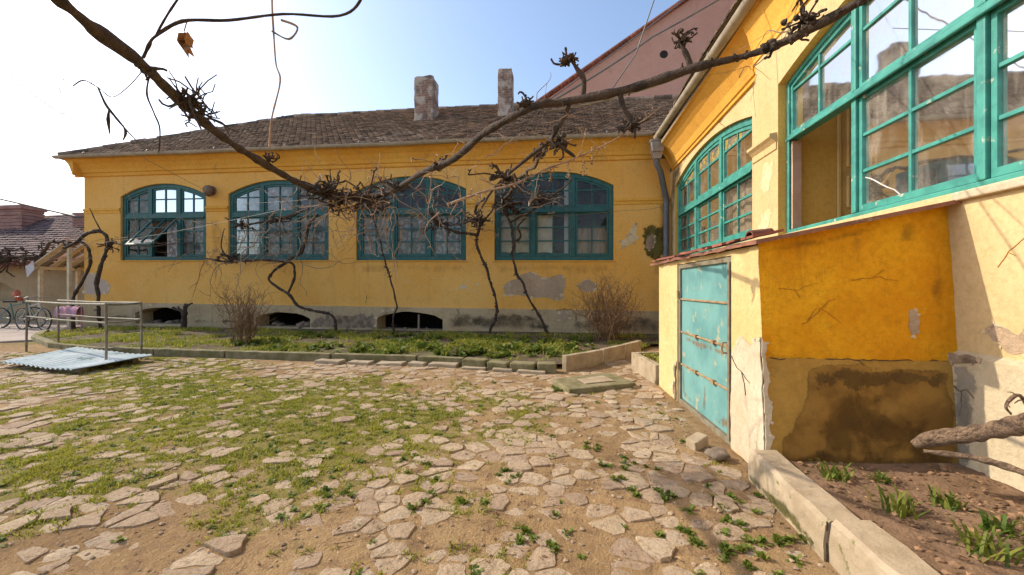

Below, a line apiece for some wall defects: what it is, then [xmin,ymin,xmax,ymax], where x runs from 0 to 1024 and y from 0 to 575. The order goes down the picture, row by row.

peeling [619,223,656,251]
flaking render [502,272,598,322]
crack [779,283,841,324]
flaking render [908,308,921,339]
peeling [730,336,775,463]
leakage [783,363,976,465]